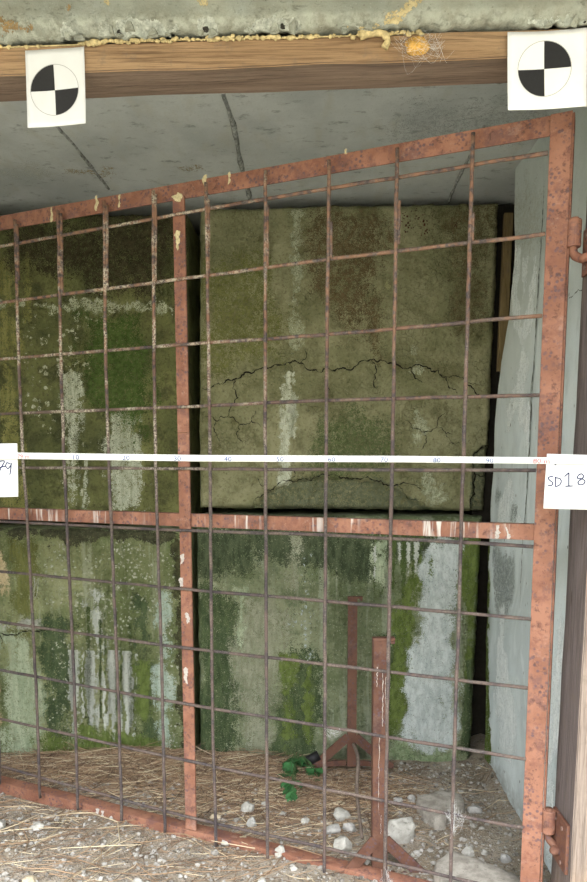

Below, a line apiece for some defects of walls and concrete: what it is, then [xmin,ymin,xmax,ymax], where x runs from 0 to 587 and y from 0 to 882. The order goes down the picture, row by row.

rust [0,16,34,37]
damp [0,214,175,325]
damp [286,205,401,368]
damp [429,204,498,339]
damp [58,371,88,509]
efflorescence [277,371,301,487]
crack [253,471,423,503]
crack [202,351,479,443]
efflorescence [418,472,449,508]
crack [409,412,488,508]
damp [0,527,184,748]
damp [192,527,444,756]